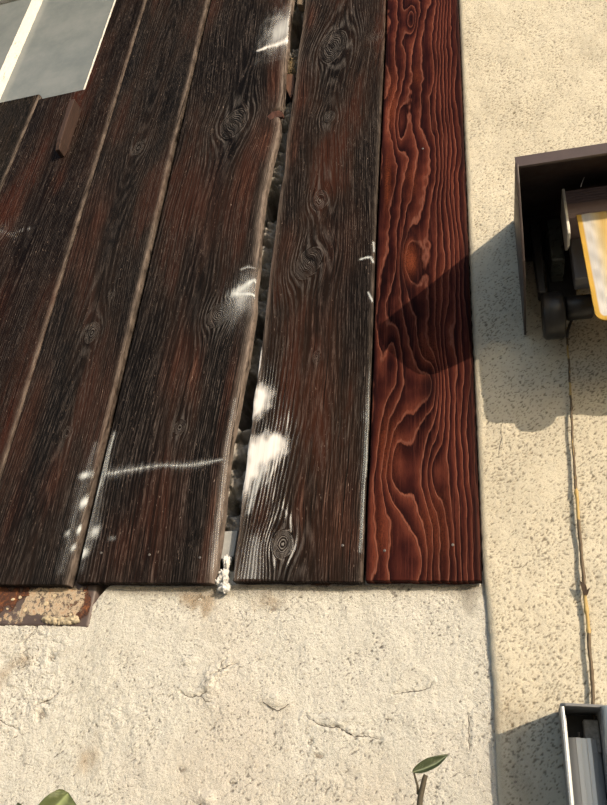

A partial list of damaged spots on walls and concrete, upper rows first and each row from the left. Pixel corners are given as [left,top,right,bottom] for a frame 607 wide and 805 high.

rust [0,587,30,613]
peeling [0,586,85,624]
rust [64,587,91,620]